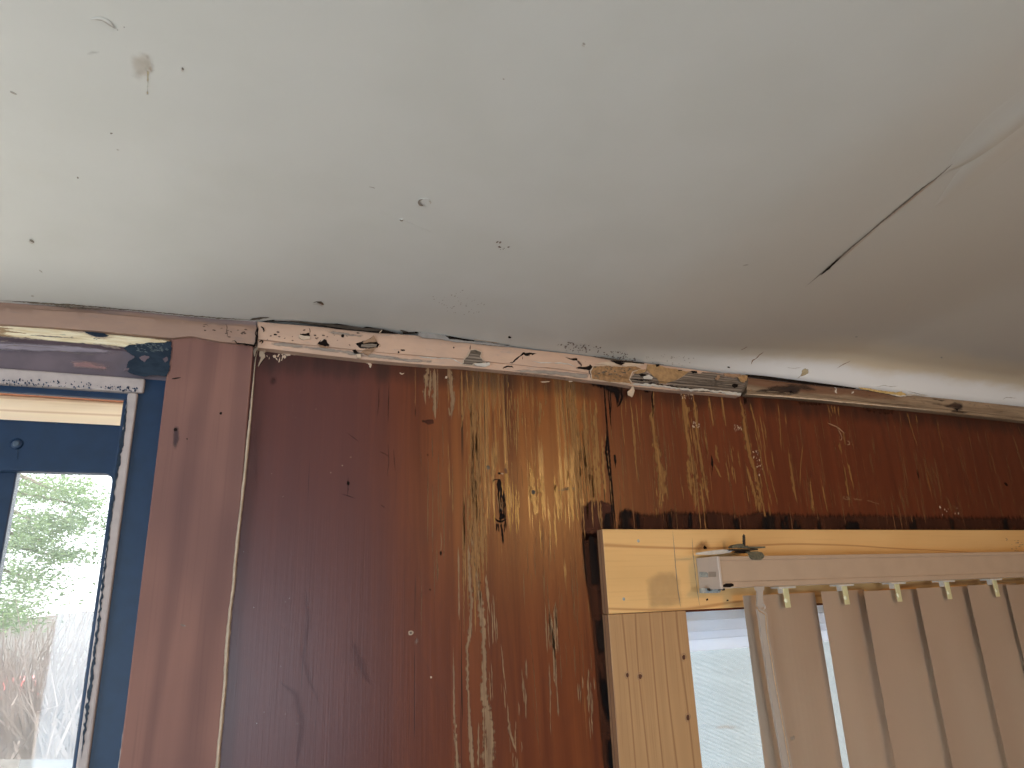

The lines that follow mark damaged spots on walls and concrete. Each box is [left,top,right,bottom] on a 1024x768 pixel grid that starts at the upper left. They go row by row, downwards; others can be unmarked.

crack [805,166,950,287]
spalling [419,347,490,367]
spalling [590,356,747,397]
leakage [415,368,1024,768]